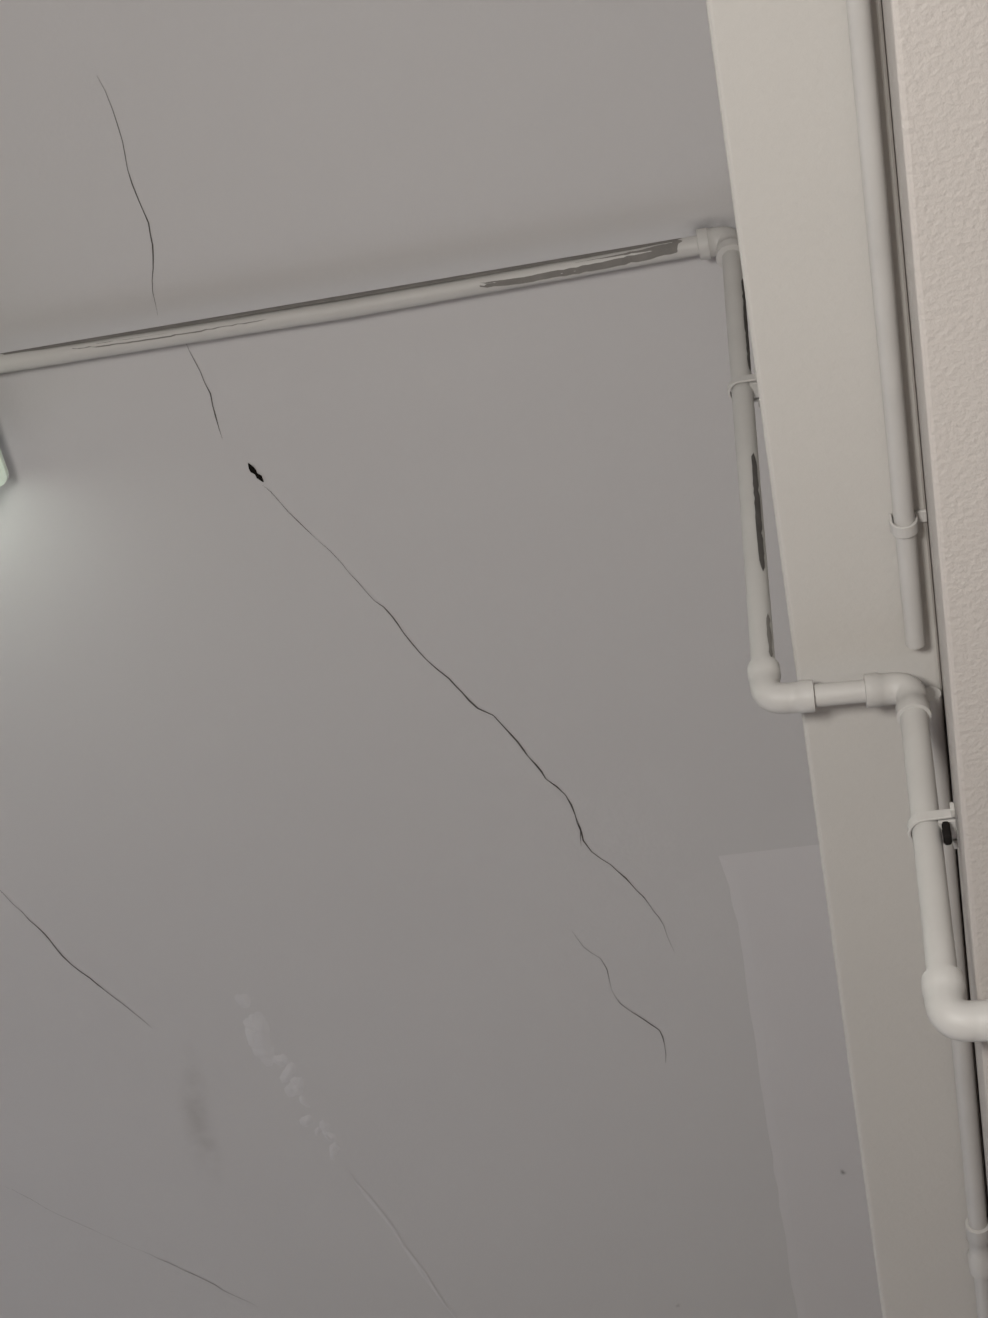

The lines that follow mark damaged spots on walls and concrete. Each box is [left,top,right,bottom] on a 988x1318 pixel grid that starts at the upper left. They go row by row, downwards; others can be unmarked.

crack [98,78,158,314]
crack [187,346,222,437]
crack [265,487,673,948]
crack [7,898,146,1023]
crack [574,934,666,1063]